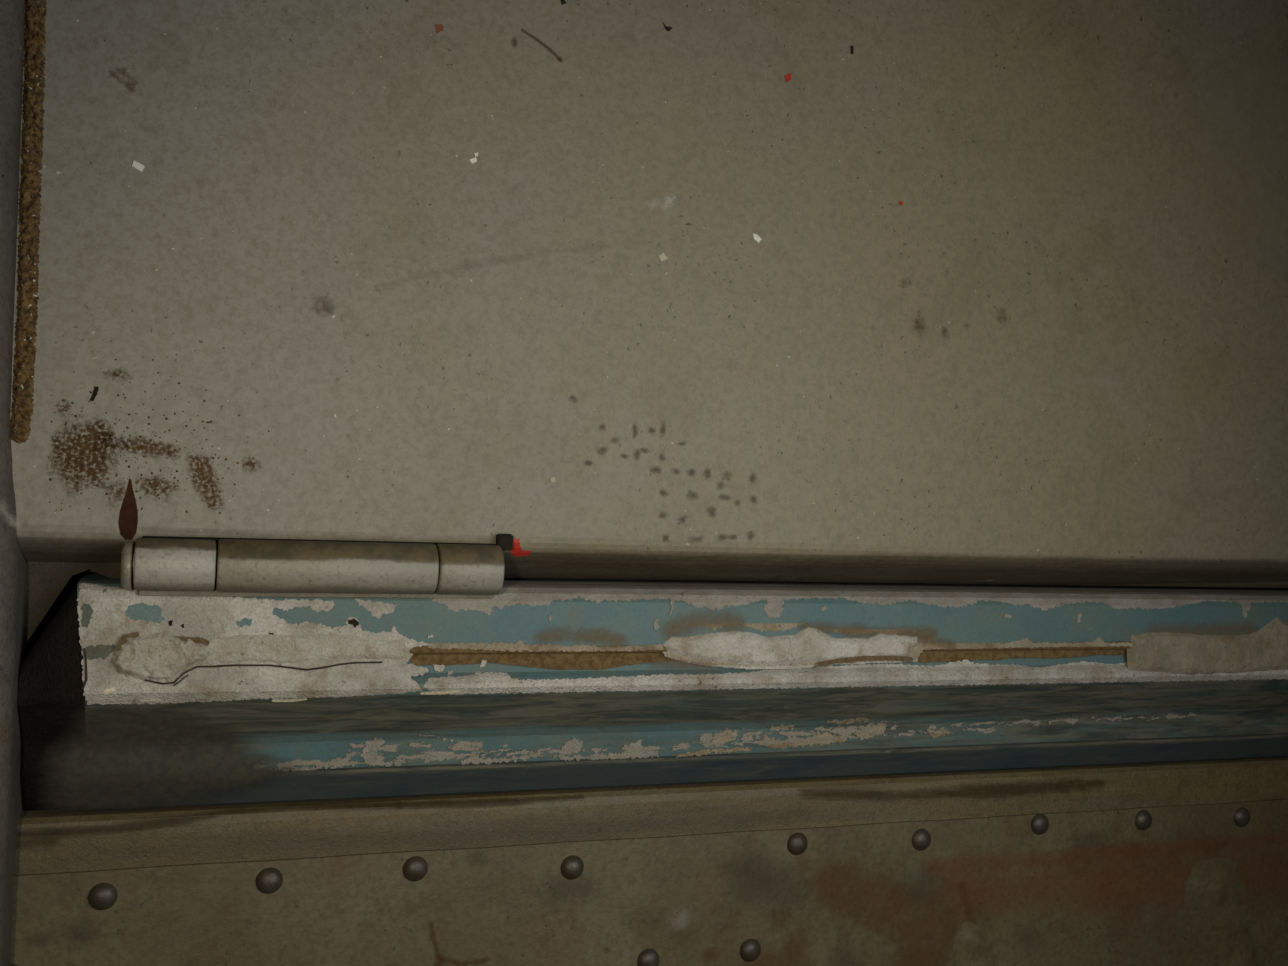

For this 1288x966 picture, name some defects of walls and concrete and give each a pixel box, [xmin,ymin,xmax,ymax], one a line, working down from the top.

rust [10,0,47,444]
rust [48,359,257,514]
crack [82,632,139,689]
crack [145,636,382,686]
peeling [77,581,1288,705]
peeling [260,711,1205,772]